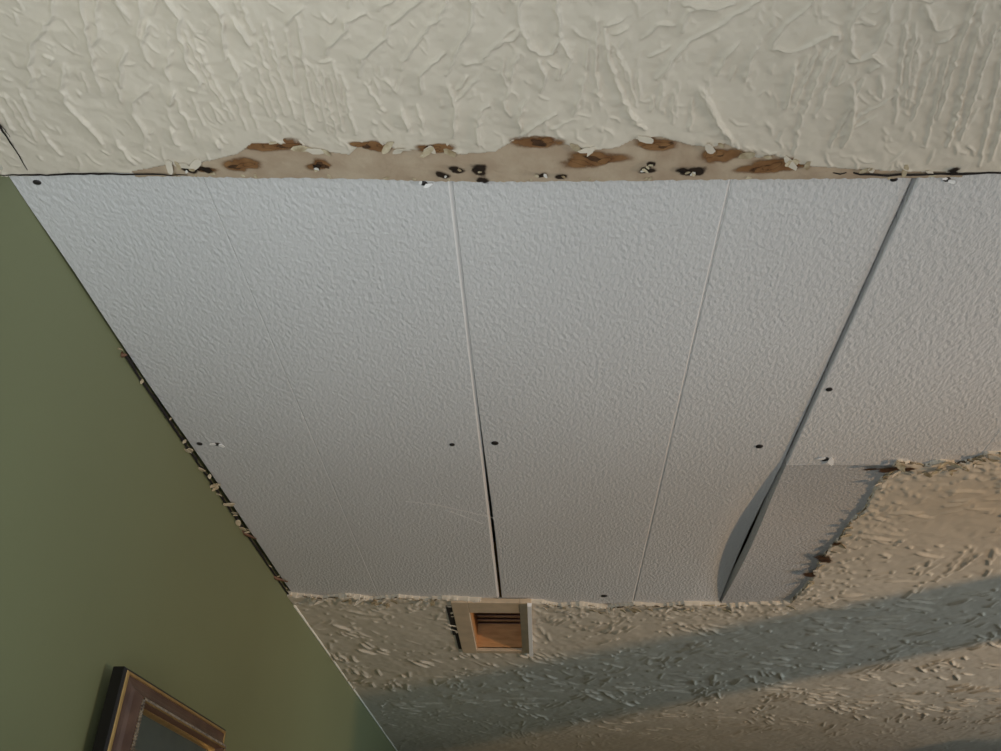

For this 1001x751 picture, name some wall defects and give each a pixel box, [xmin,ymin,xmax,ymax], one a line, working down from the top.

peeling [133,136,963,188]
spalling [863,455,1001,491]
spalling [803,513,865,589]